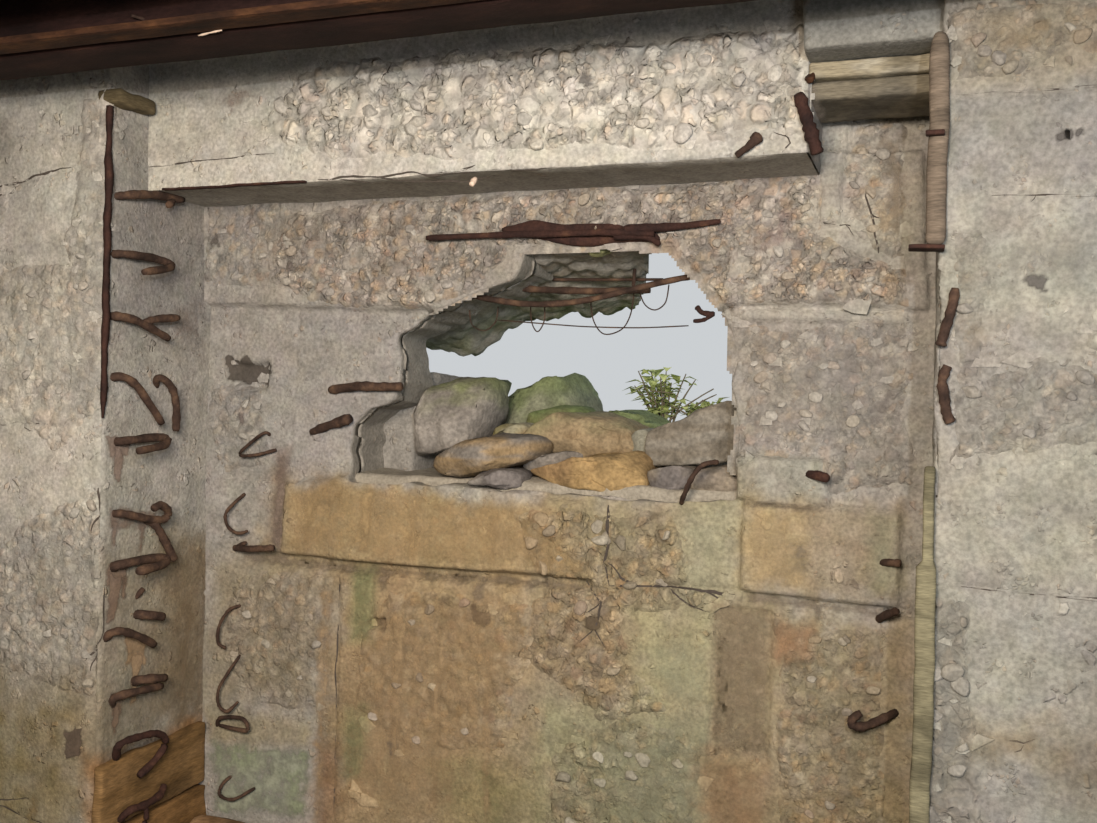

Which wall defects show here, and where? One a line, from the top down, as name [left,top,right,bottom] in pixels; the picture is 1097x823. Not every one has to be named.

spalling [240,17,815,166]
corrosion [735,132,763,158]
corrosion [794,92,824,156]
spalling [1057,129,1083,141]
crack [0,167,71,196]
corrosion [908,244,945,252]
spalling [204,118,918,501]
spalling [935,230,1097,469]
corrosion [106,436,130,482]
corrosion [111,508,155,550]